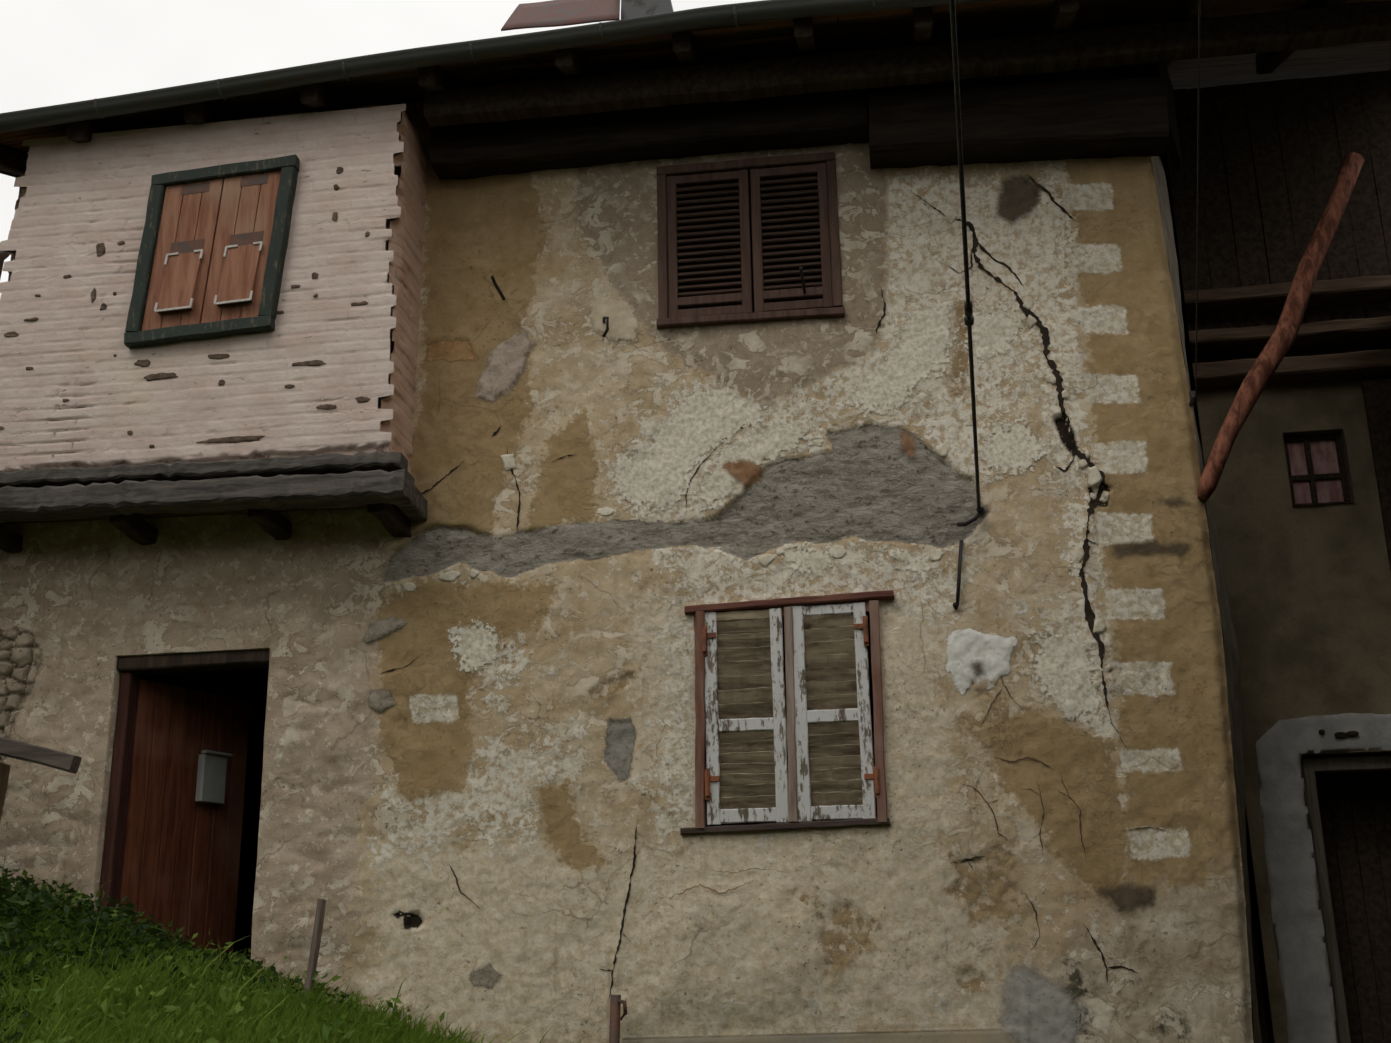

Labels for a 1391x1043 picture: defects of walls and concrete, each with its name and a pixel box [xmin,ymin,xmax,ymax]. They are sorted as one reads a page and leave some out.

crack [1027,174,1078,222]
flaking render [383,300,1050,592]
crack [906,188,1127,748]
crack [950,757,1087,871]
crack [600,814,638,998]
crack [1025,893,1040,951]
crack [1083,924,1139,980]